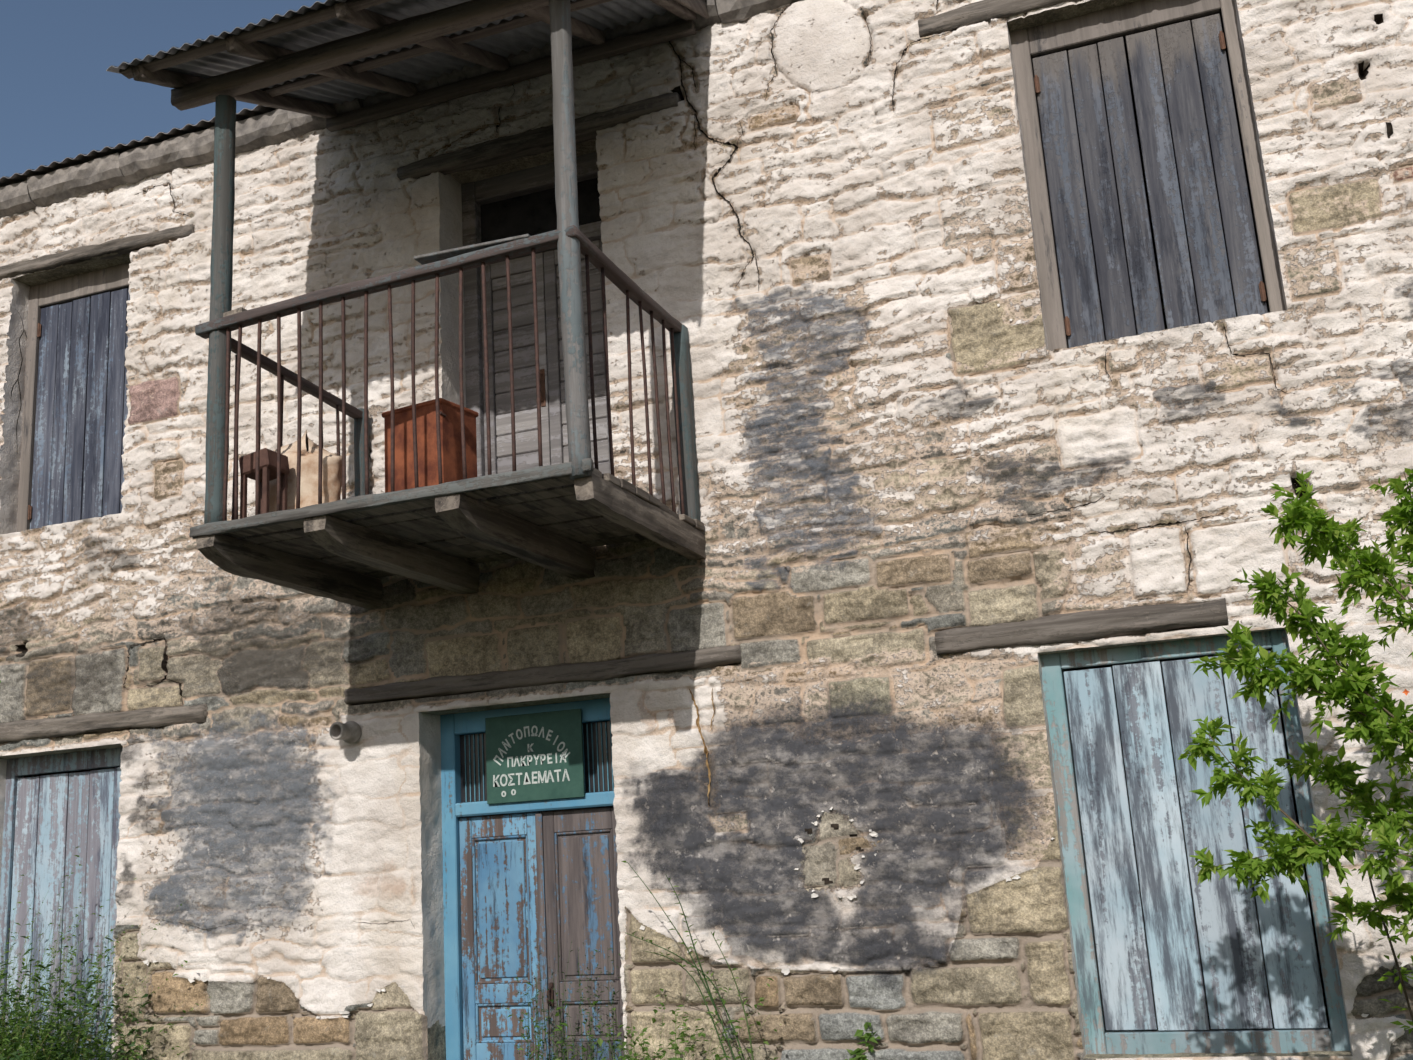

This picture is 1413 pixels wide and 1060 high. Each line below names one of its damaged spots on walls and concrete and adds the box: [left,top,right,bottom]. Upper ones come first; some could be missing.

crack [669,2,794,291]
water stain [731,289,881,590]
water stain [115,864,134,900]
water stain [120,711,328,942]
spalling [113,925,428,1060]
water stain [634,771,696,871]
spalling [623,826,1096,1060]
water stain [834,937,948,981]